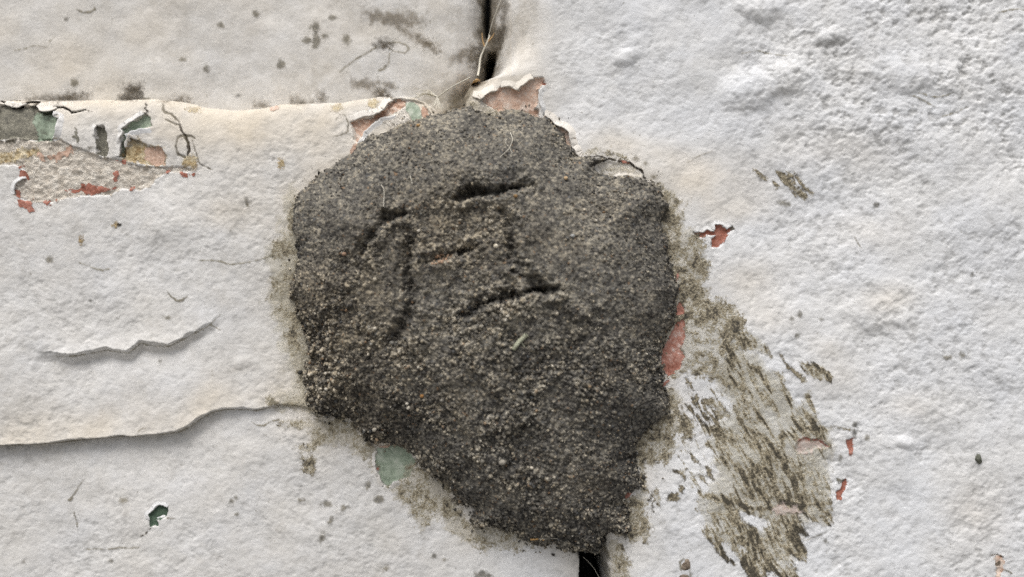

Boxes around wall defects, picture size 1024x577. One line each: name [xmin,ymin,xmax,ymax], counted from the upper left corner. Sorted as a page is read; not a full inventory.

crack [485,0,495,80]
peeling [0,100,198,213]
peeling [350,97,435,154]
peeling [472,73,583,158]
peeling [694,220,735,247]
peeling [661,302,686,387]
damp [599,182,834,577]
peeling [141,501,169,536]